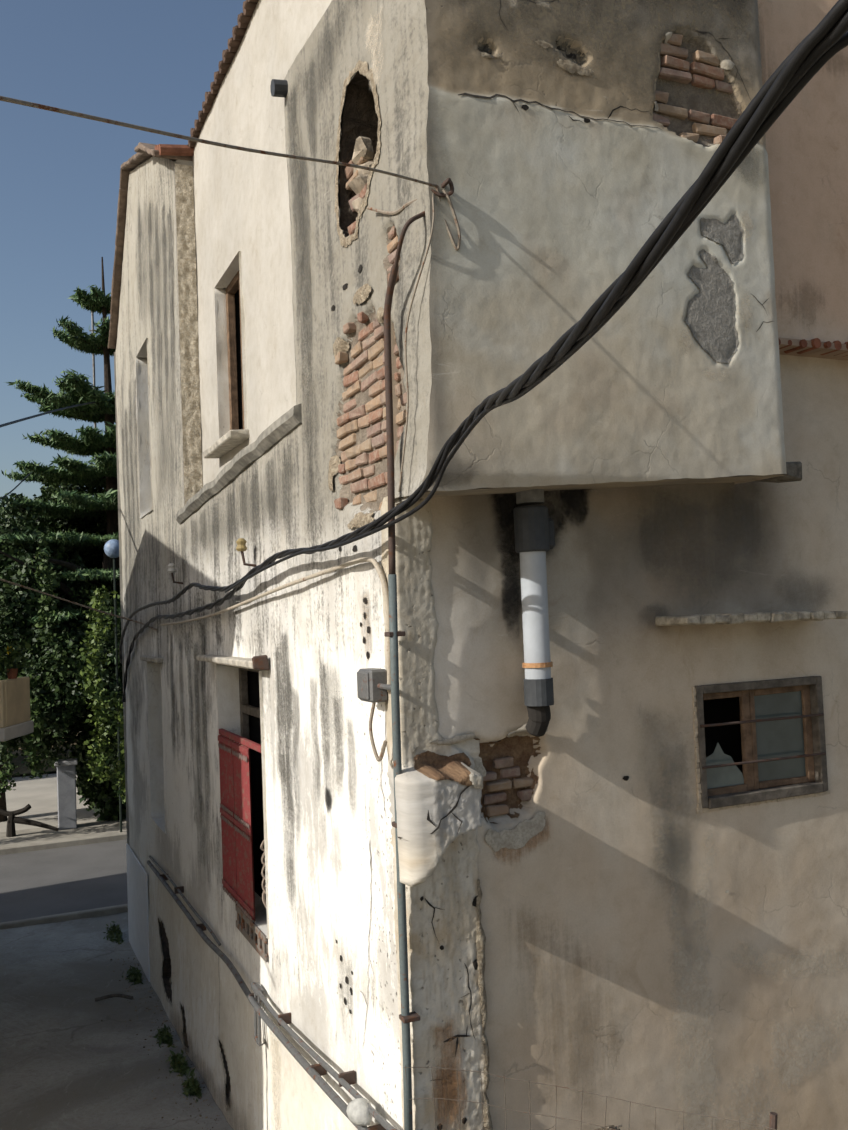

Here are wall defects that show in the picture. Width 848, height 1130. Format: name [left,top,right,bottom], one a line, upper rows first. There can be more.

spalling [335,60,389,247]
crack [458,93,665,132]
damp [452,0,749,99]
spalling [653,32,742,147]
peeling [684,214,752,373]
spalling [328,265,407,529]
damp [493,489,588,626]
damp [276,654,298,811]
damp [316,746,331,810]
spalling [412,723,548,852]
crack [425,898,444,942]
crack [430,963,475,1081]